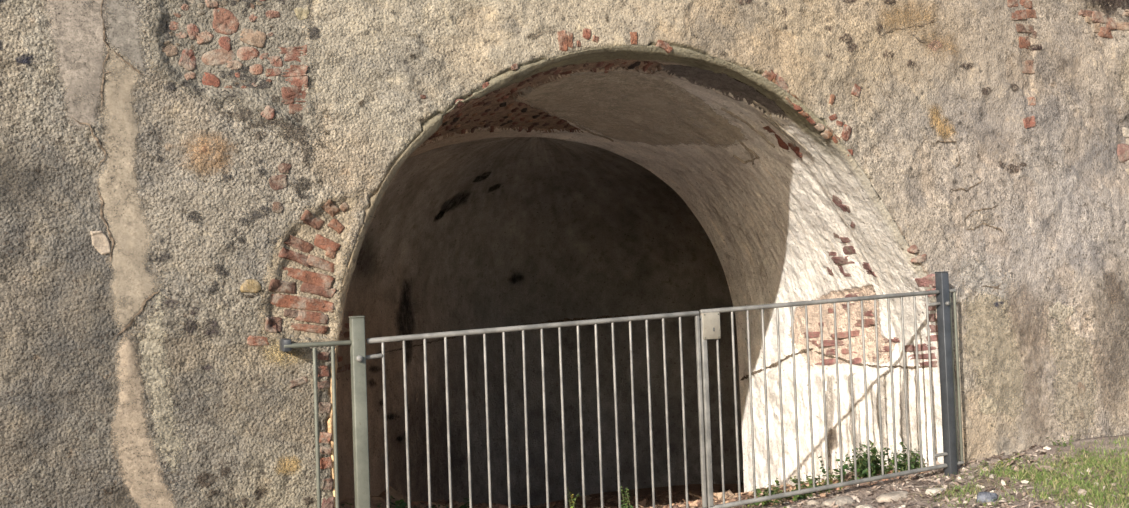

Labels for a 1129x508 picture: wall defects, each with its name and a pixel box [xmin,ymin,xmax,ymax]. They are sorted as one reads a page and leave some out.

spalling [148,0,318,131]
spalling [557,28,599,51]
spalling [418,40,853,165]
spalling [1007,0,1042,74]
spalling [1078,9,1129,38]
damp [1086,0,1129,15]
spalling [269,163,292,213]
damp [434,172,501,221]
spalling [247,190,360,414]
damp [397,281,414,363]
spalling [788,195,939,367]
crack [741,348,929,380]